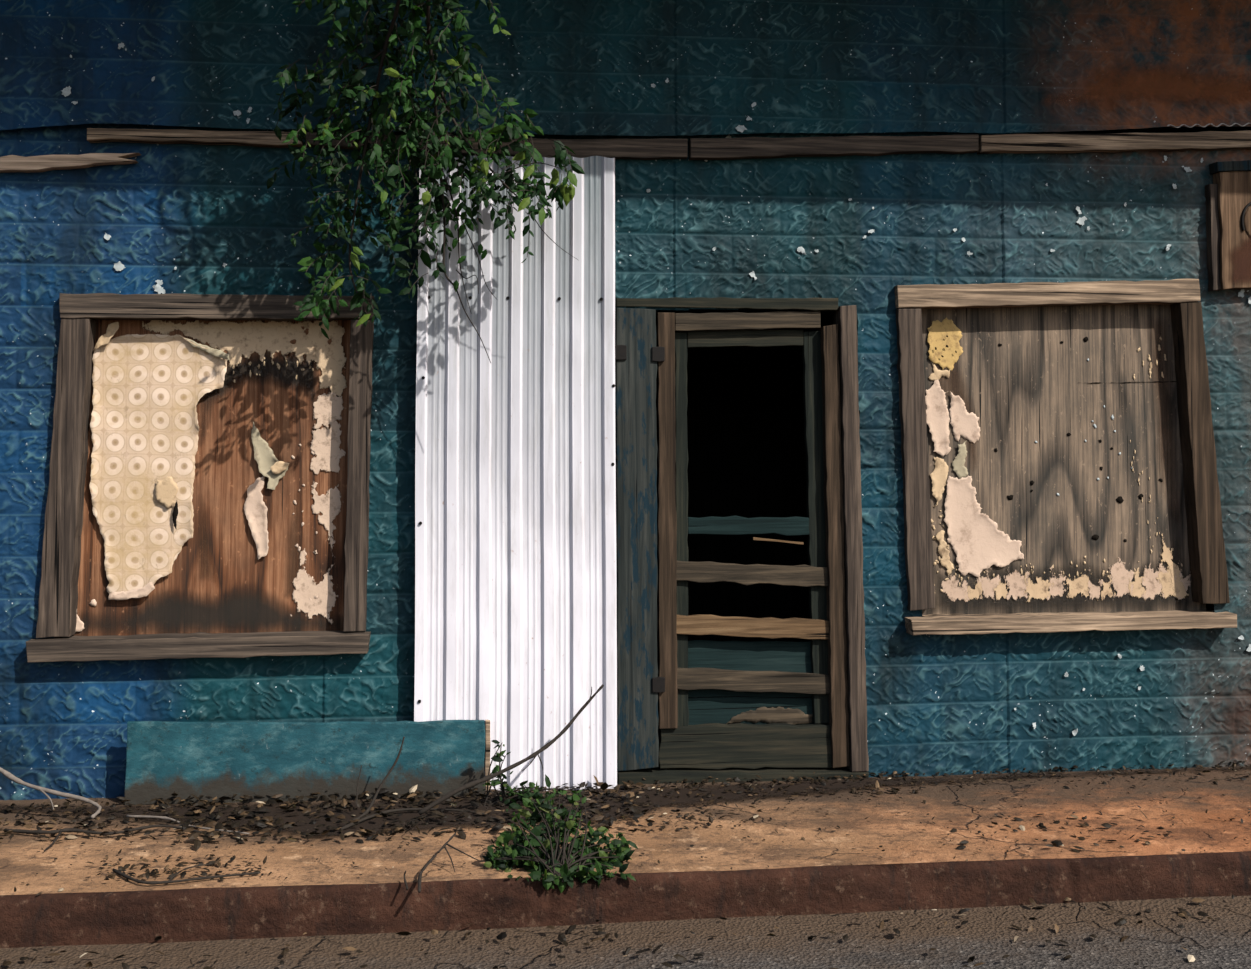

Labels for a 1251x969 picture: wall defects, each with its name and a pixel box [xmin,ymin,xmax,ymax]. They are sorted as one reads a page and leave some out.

peeling [1133,337,1166,380]
peeling [142,320,347,624]
peeling [941,517,1191,602]